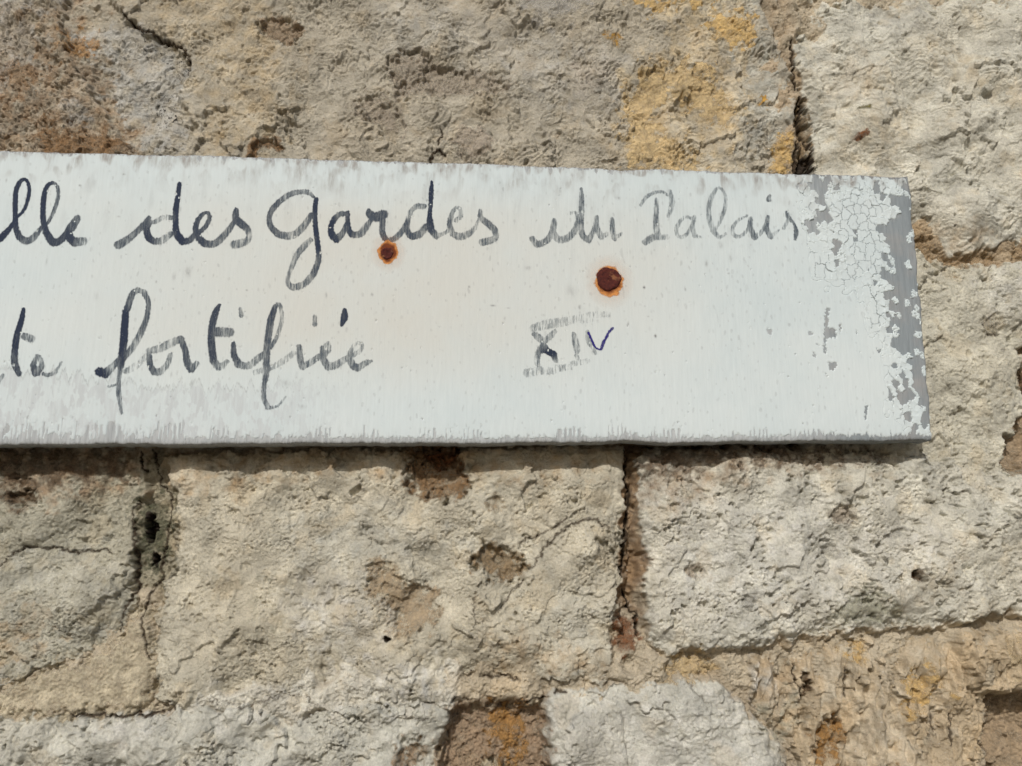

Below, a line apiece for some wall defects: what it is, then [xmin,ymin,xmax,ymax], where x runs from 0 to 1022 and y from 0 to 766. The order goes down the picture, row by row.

crack [122,11,192,74]
crack [789,40,814,174]
spalling [999,416,1022,473]
crack [2,449,173,660]
crack [503,449,637,635]
crack [77,710,165,719]